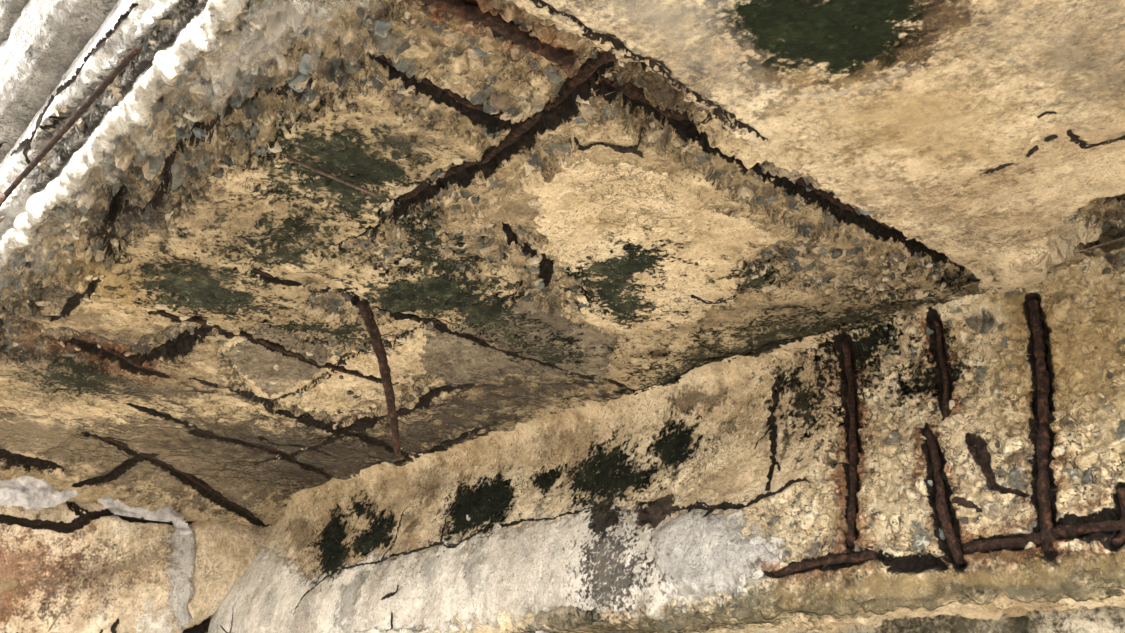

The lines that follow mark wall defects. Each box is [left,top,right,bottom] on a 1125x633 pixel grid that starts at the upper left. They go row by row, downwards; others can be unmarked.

crack [0,3,138,164]
leakage [738,0,975,108]
leakage [0,283,75,323]
crack [0,501,196,534]
peeling [183,499,774,633]
leakage [563,494,676,631]
crack [584,334,818,517]
spalling [750,378,878,578]
spalling [881,550,948,574]
corrosion [943,464,983,512]
corrosion [965,432,1036,514]
corrosion [960,529,1123,564]